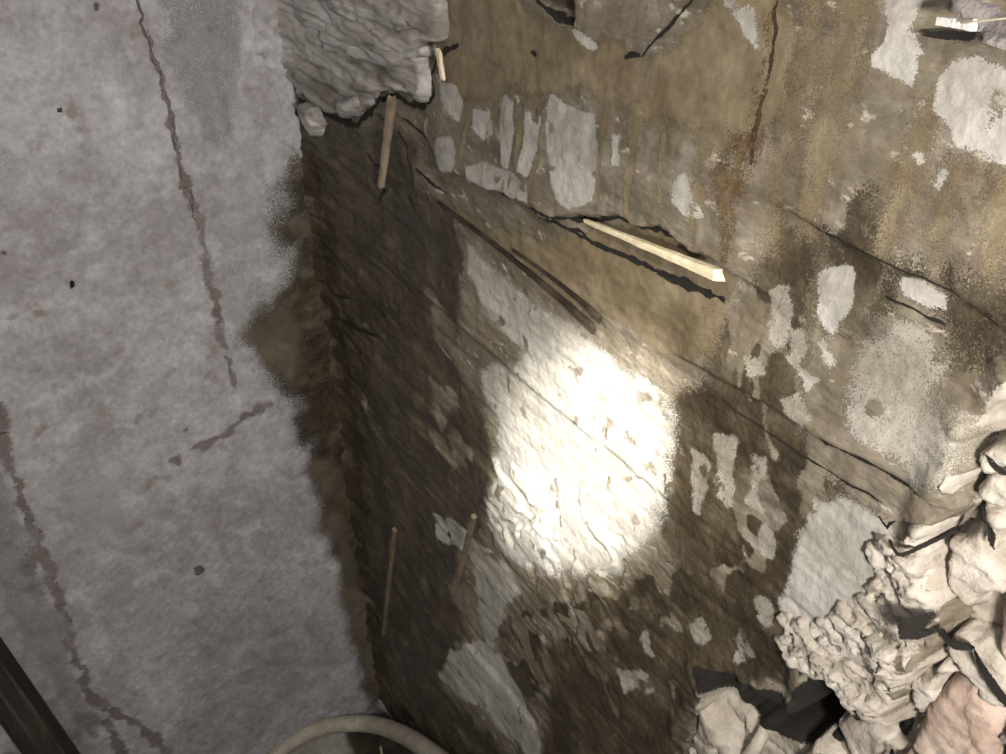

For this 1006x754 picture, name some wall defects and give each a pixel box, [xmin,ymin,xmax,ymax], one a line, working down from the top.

damp [0,402,174,754]
crack [135,0,237,388]
damp [167,90,501,754]
spalling [536,0,598,51]
crack [494,190,726,303]
crack [624,0,693,60]
corrosion [707,0,779,265]
damp [498,0,1006,754]
crack [702,368,974,557]
spalling [692,262,1006,754]